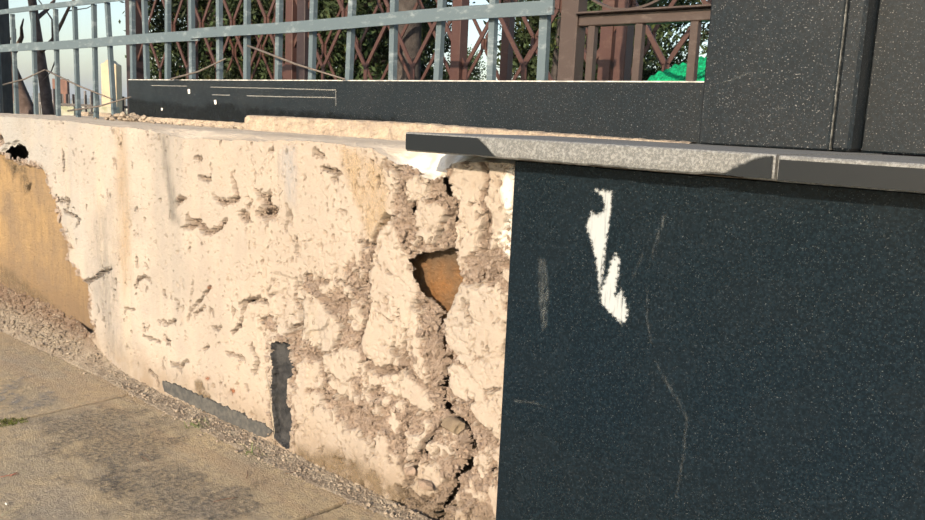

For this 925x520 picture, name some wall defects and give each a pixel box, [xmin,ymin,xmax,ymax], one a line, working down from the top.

peeling [0,133,112,340]
spalling [212,146,515,520]
crack [296,176,502,520]
crack [481,162,503,283]